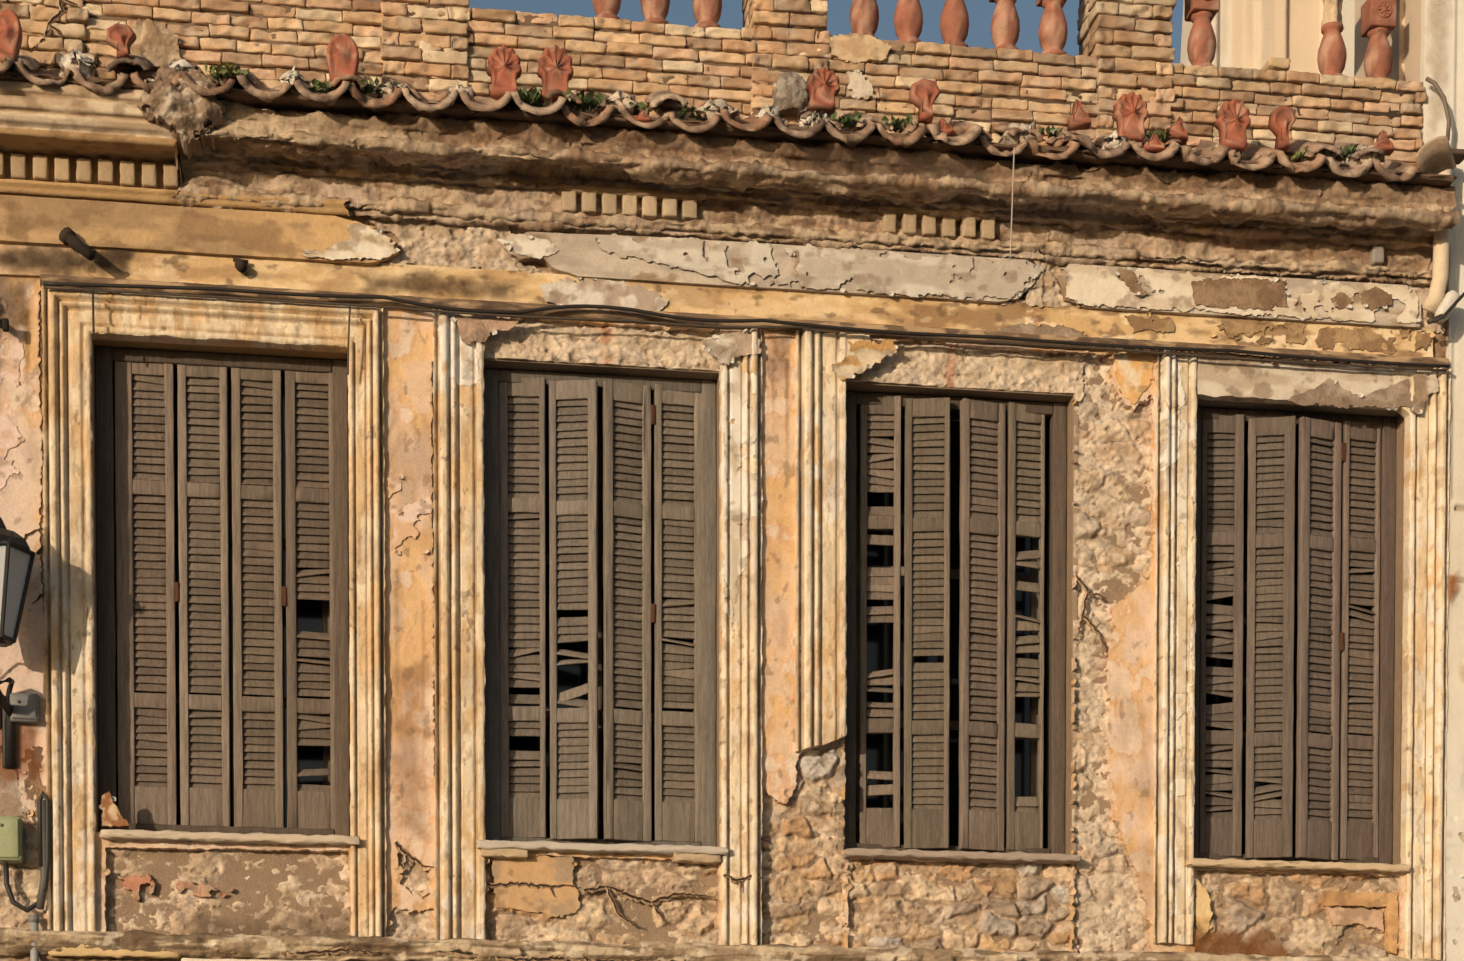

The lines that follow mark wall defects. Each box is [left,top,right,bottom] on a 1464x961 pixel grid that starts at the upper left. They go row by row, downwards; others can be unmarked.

damp [804,144,983,175]
flaking render [302,219,763,622]
flaking render [595,233,1445,960]
crack [1075,574,1107,656]
peeling [99,792,129,828]
flaking render [101,848,350,936]
flaking render [386,851,436,940]
crack [433,873,762,961]
flaking render [485,857,721,945]
peeling [1452,873,1464,903]